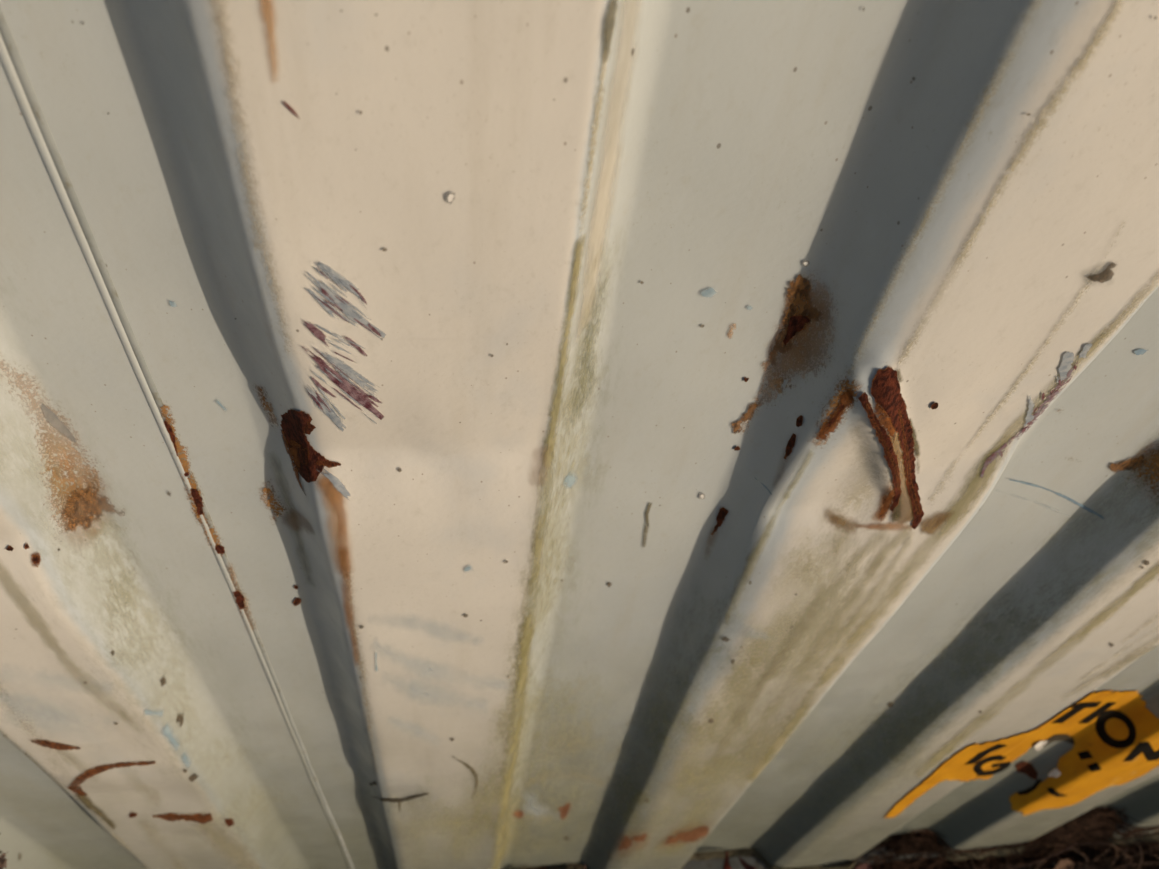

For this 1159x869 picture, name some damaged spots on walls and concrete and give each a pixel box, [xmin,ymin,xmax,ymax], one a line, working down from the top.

corrosion [769,275,821,397]
leakage [1068,300,1136,372]
corrosion [40,404,113,531]
corrosion [160,405,225,554]
corrosion [784,415,803,459]
corrosion [816,376,860,446]
leakage [890,431,914,524]
leakage [939,430,1014,537]
corrosion [228,566,245,610]
leakage [1068,565,1159,642]
corrosion [68,761,156,828]
corrosion [153,813,234,827]